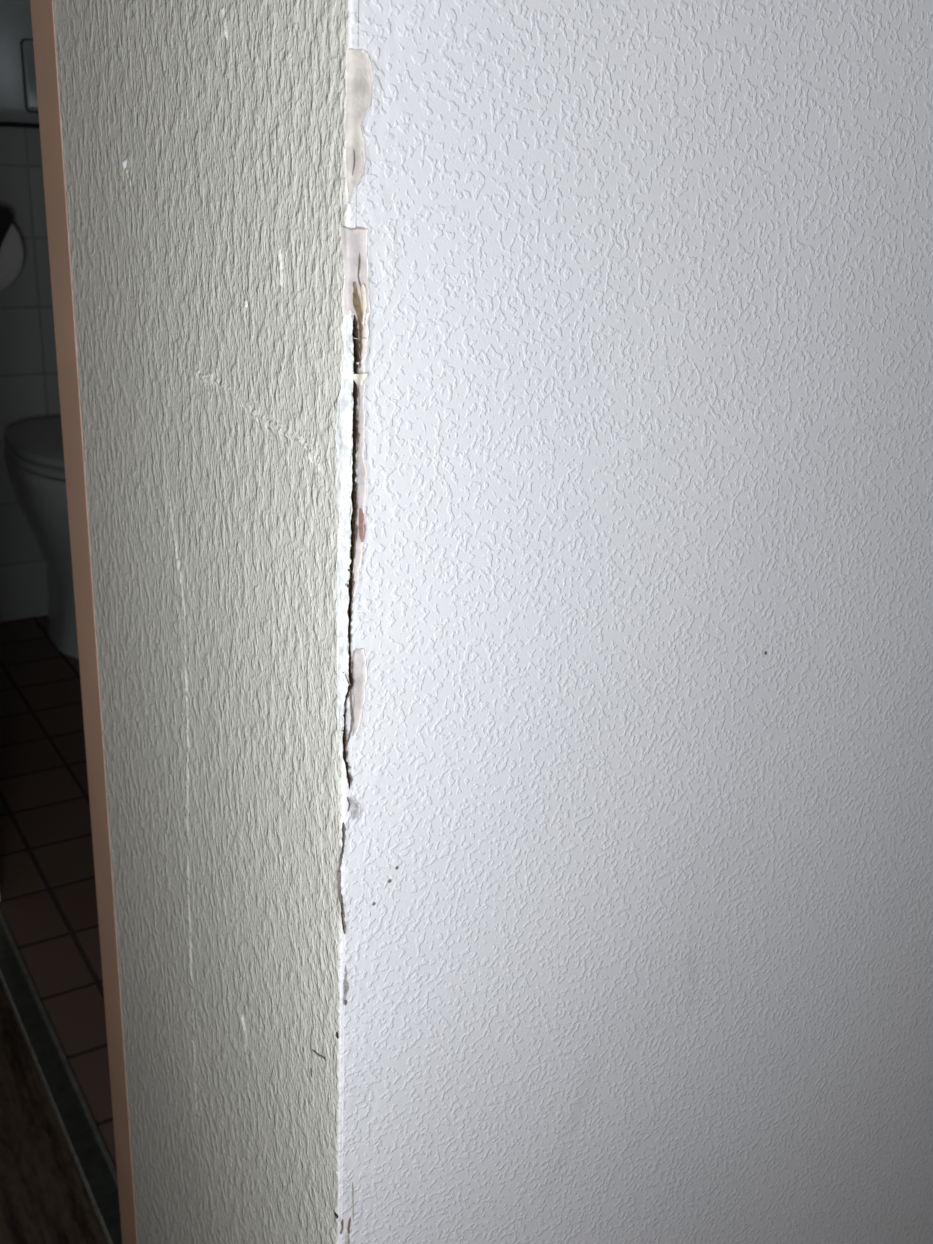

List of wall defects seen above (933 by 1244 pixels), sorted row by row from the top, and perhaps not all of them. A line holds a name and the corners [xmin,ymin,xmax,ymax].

peeling [345,48,374,204]
crack [337,315,368,934]